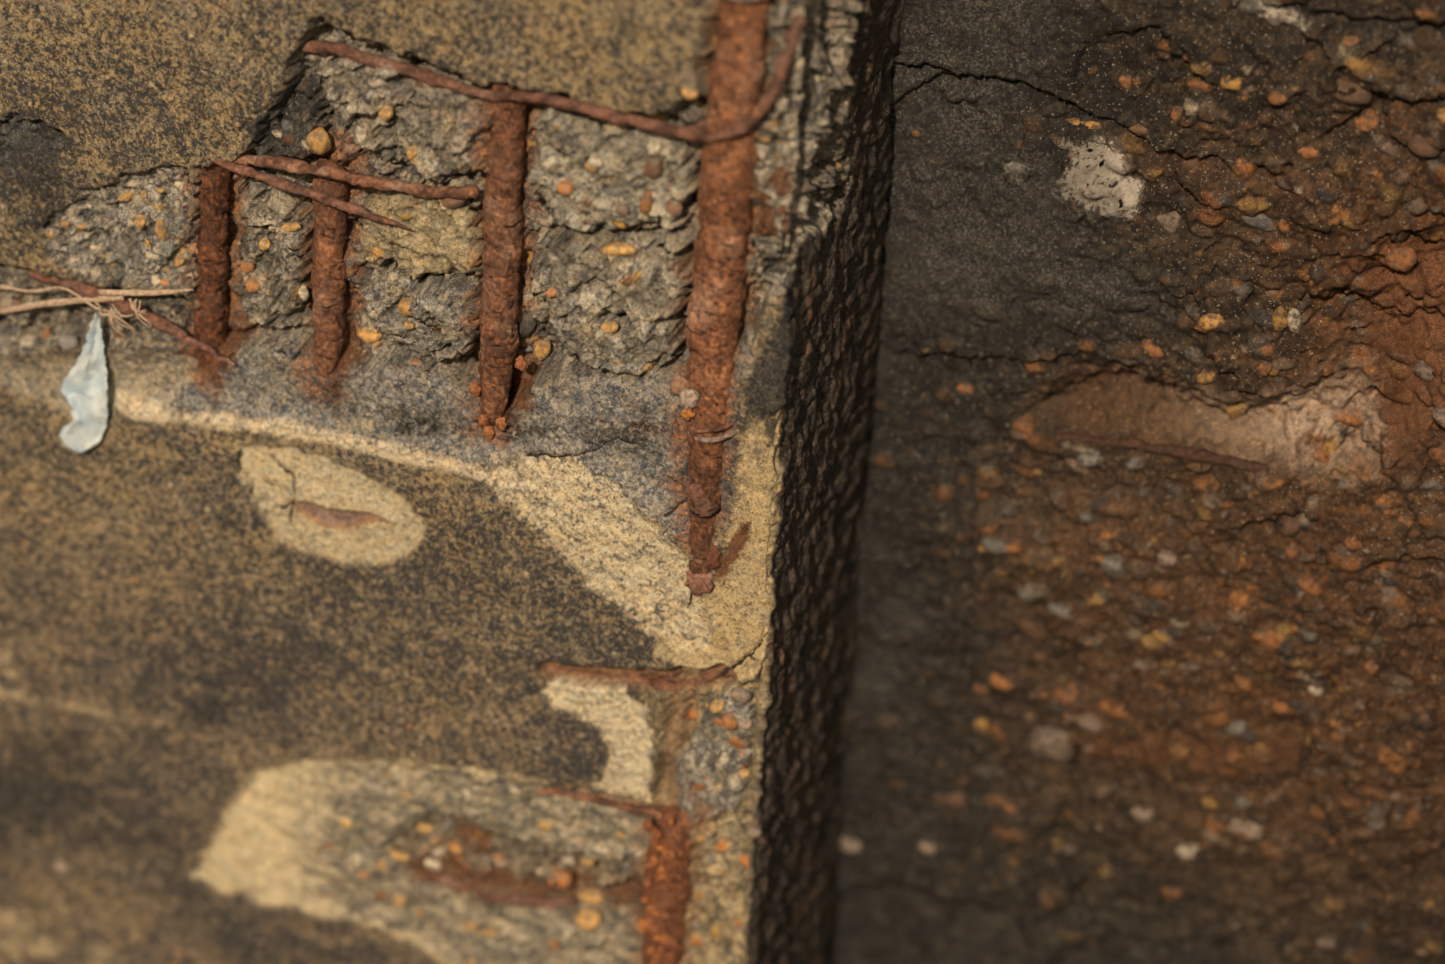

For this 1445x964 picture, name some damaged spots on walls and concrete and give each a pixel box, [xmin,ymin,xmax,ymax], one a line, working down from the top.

corrosion [752,162,795,237]
damp [870,0,1192,433]
corrosion [195,310,260,407]
corrosion [330,326,371,397]
corrosion [469,355,542,441]
corrosion [634,375,701,441]
spalling [1017,209,1445,489]
corrosion [1327,231,1445,481]
spalling [0,0,866,964]
corrosion [684,521,752,596]